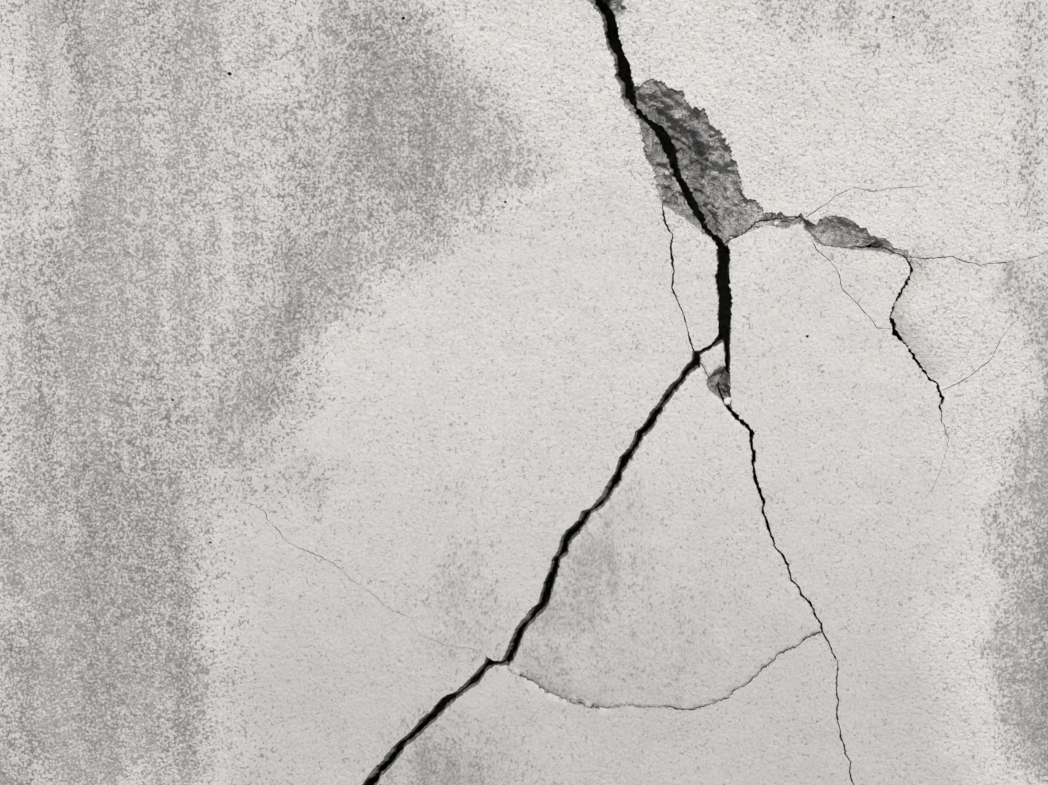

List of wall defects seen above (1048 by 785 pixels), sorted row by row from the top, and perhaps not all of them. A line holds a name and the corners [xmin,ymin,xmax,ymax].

damp [0,0,567,785]
spalling [587,0,627,19]
crack [242,0,1046,785]
spalling [621,79,912,263]
damp [974,257,1048,783]
damp [1014,2,1048,223]